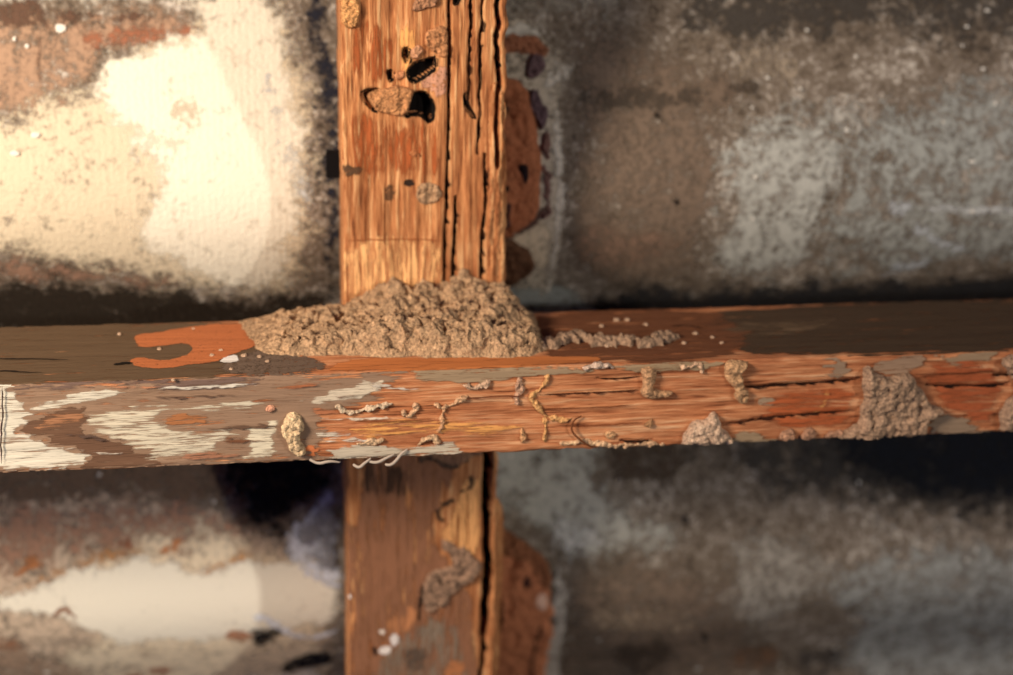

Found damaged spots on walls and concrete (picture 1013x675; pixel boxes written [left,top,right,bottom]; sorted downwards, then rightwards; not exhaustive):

leakage [0,0,363,327]
crack [346,0,501,279]
leakage [506,0,1013,313]
peeling [0,384,122,471]
peeling [87,405,277,460]
peeling [186,401,262,411]
peeling [311,380,384,404]
peeling [316,432,463,459]
crack [456,452,494,675]
leakage [496,431,1013,675]